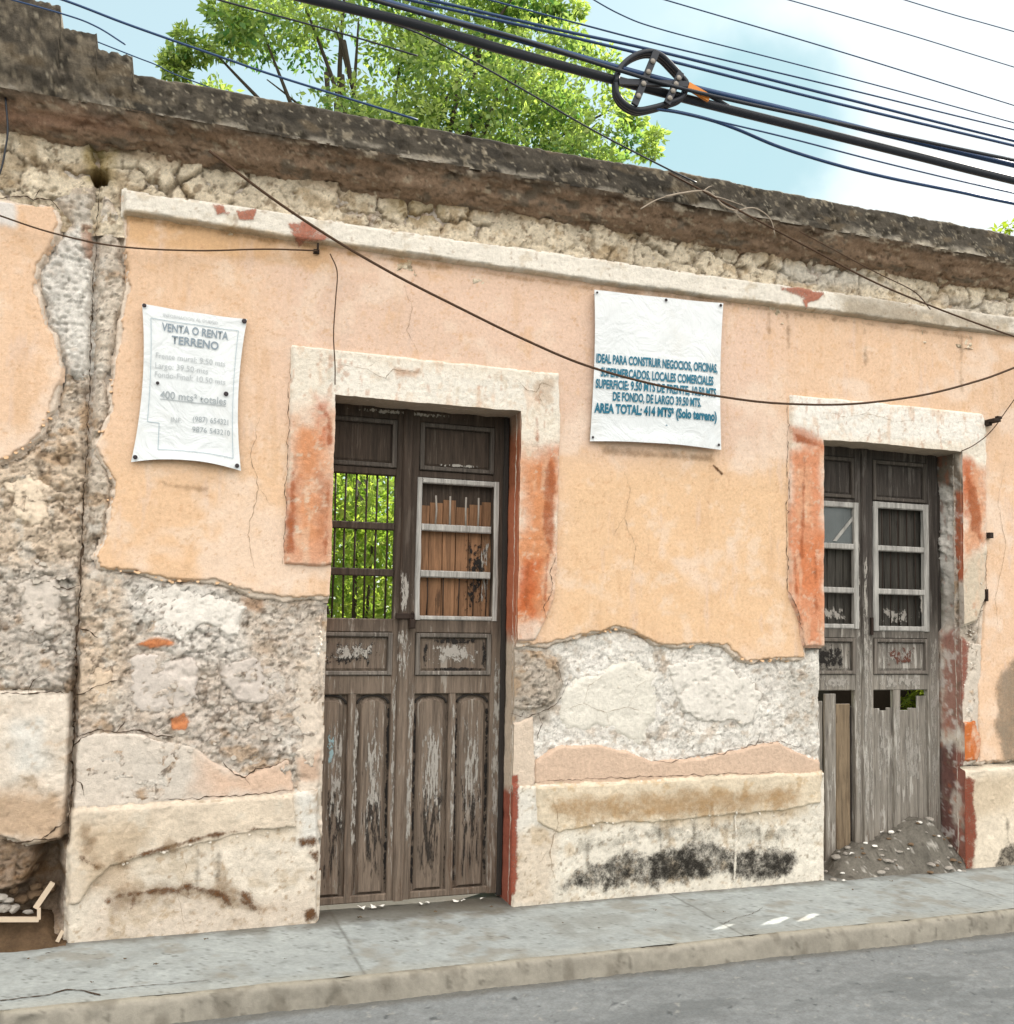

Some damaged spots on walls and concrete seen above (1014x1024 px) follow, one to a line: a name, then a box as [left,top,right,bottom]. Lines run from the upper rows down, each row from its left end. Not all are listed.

spalling [0,132,1014,895]
damp [563,811,796,891]